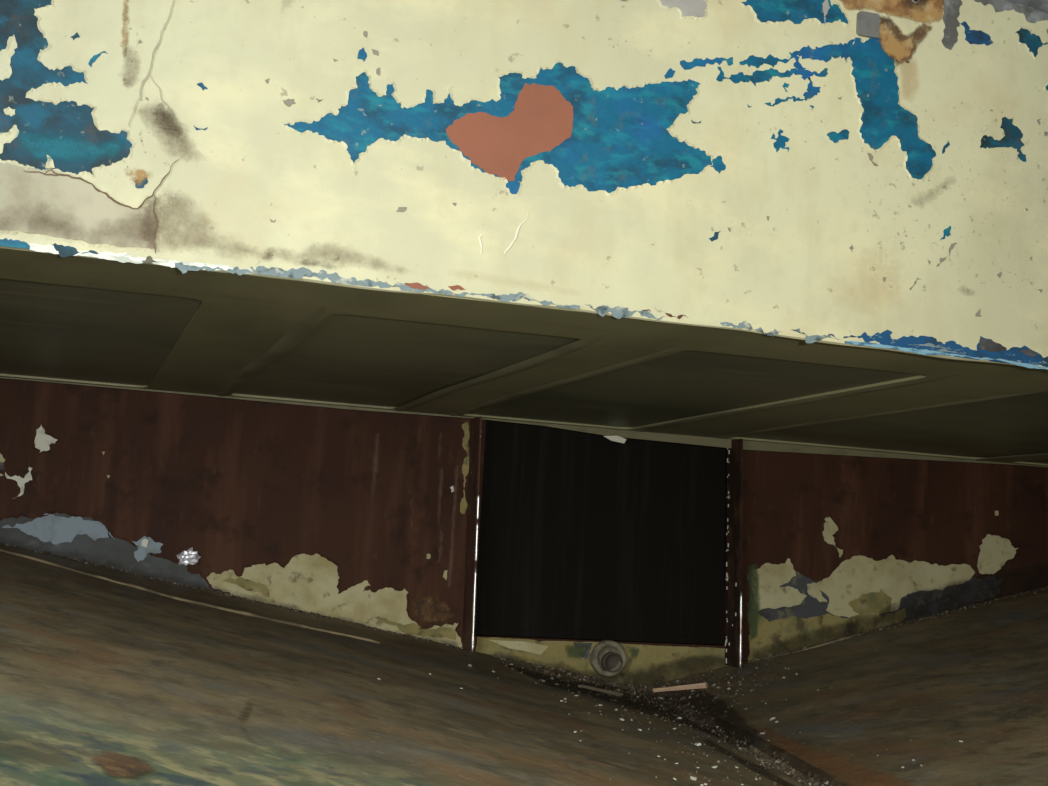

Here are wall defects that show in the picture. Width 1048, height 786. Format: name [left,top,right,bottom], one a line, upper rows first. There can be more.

peeling [0,0,136,178]
crack [129,0,175,127]
leakage [155,106,179,133]
peeling [280,0,950,198]
corrosion [842,0,944,65]
spalling [941,0,1048,60]
peeling [980,117,1026,162]
crack [25,159,179,254]
peeling [0,238,685,320]
peeling [720,321,1048,370]
peeling [0,510,462,648]
peeling [746,512,1018,661]